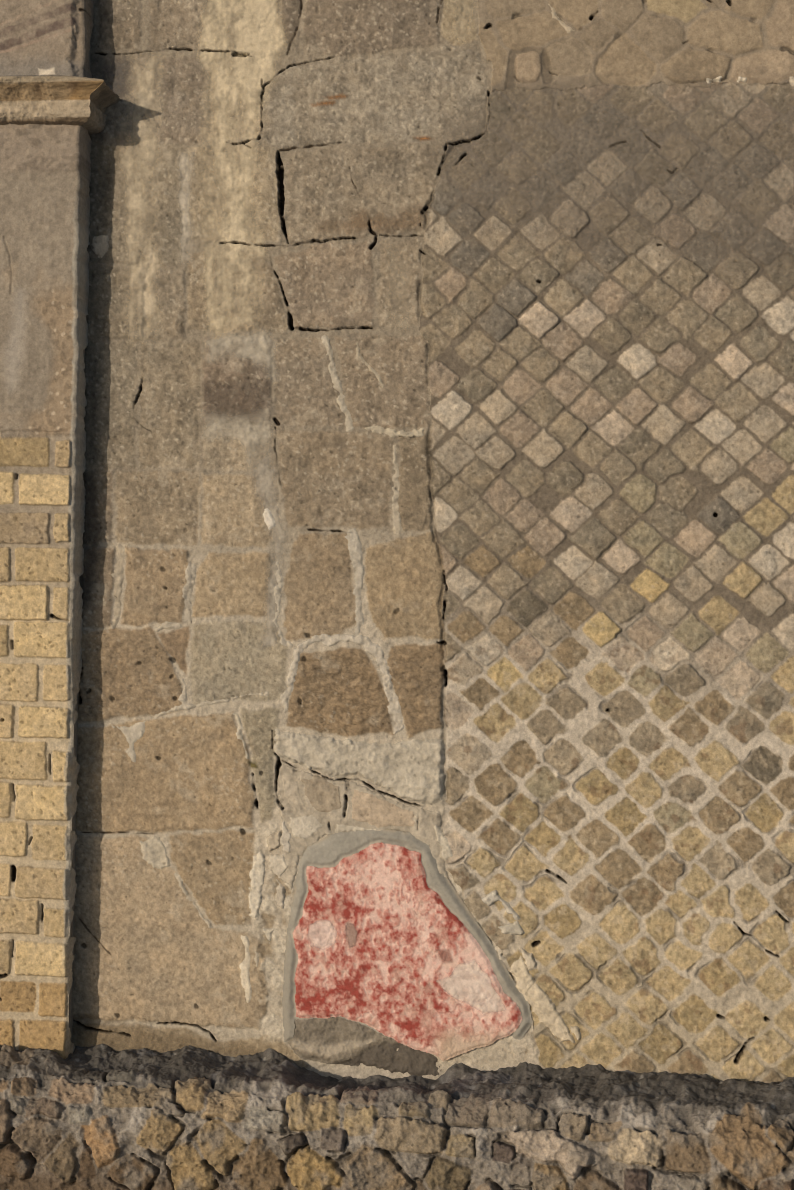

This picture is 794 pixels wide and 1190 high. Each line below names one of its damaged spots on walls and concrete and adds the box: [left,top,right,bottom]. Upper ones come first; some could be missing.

crack [96,48,250,57]
crack [220,0,428,535]
crack [437,571,448,686]
crack [154,528,418,830]
crack [74,1020,131,1036]
crack [159,1021,217,1041]
crack [734,1016,769,1064]